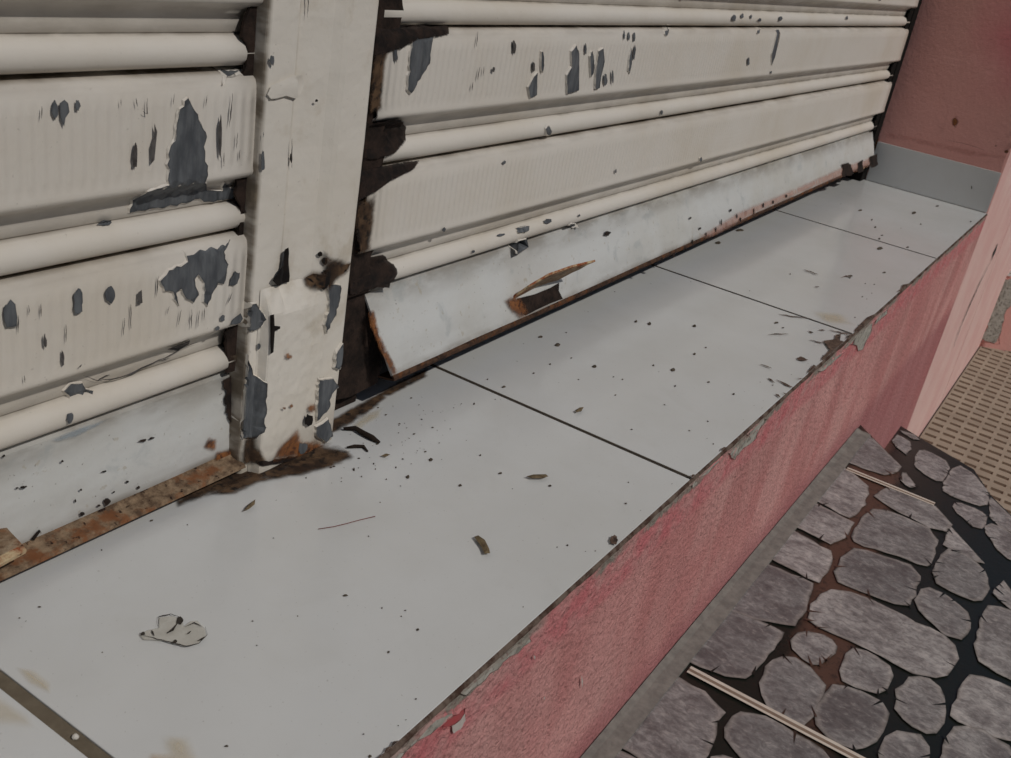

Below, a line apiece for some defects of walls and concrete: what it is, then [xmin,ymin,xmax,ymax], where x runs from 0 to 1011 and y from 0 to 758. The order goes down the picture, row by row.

peeling [127,96,235,214]
peeling [158,239,240,307]
peeling [215,301,266,332]
peeling [322,283,342,334]
rust [506,297,526,317]
peeling [231,343,268,440]
peeling [298,342,344,454]
spalling [378,637,531,758]